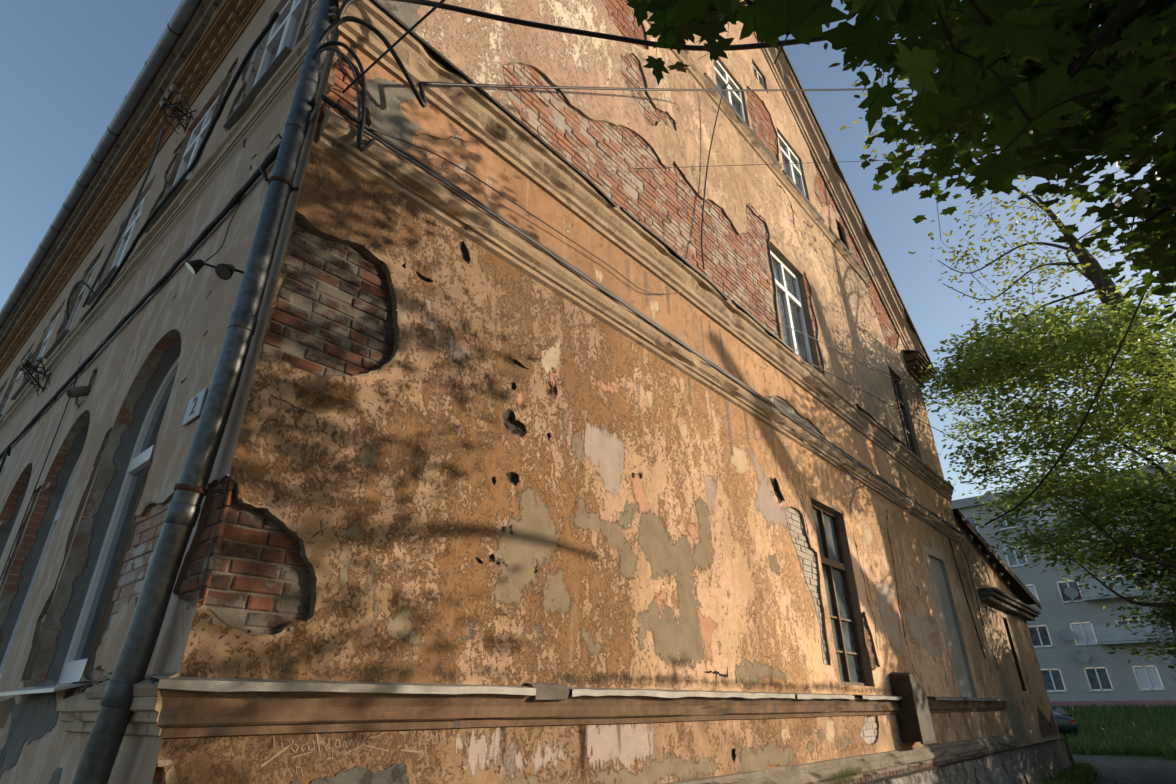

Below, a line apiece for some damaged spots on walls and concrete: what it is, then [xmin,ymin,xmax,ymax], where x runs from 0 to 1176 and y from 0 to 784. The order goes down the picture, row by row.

flaking render [378,0,421,31]
flaking render [503,0,782,340]
flaking render [262,211,474,381]
flaking render [0,427,175,778]
flaking render [172,475,317,636]
flaking render [475,422,719,671]
flaking render [734,659,786,690]
flaking render [729,428,831,666]
flaking render [291,763,409,784]